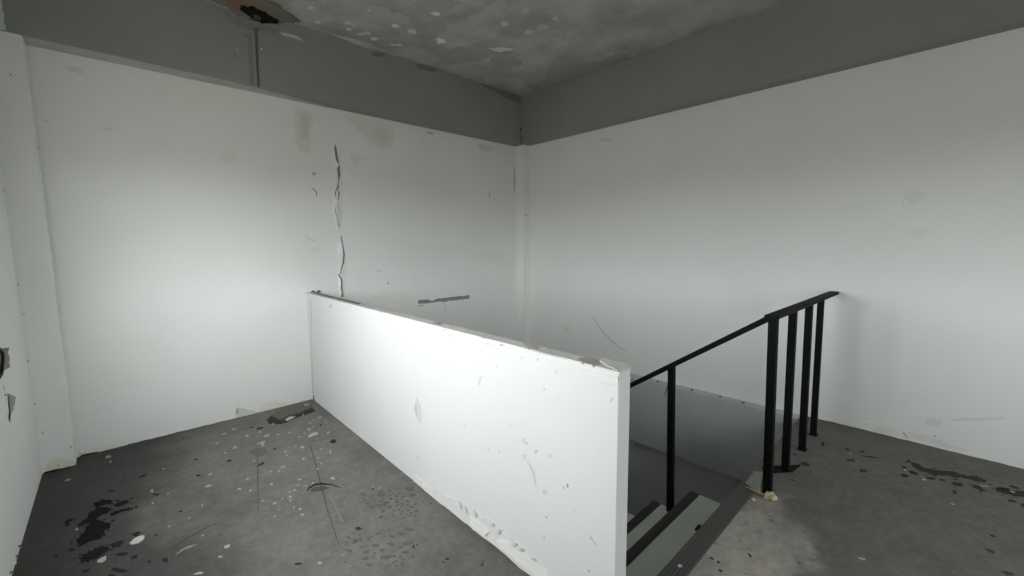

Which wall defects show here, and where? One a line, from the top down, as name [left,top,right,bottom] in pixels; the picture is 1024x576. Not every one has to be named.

crack [334,145,345,297]
flaking render [418,295,469,304]
flaking render [0,347,10,370]
peeling [413,475,552,576]